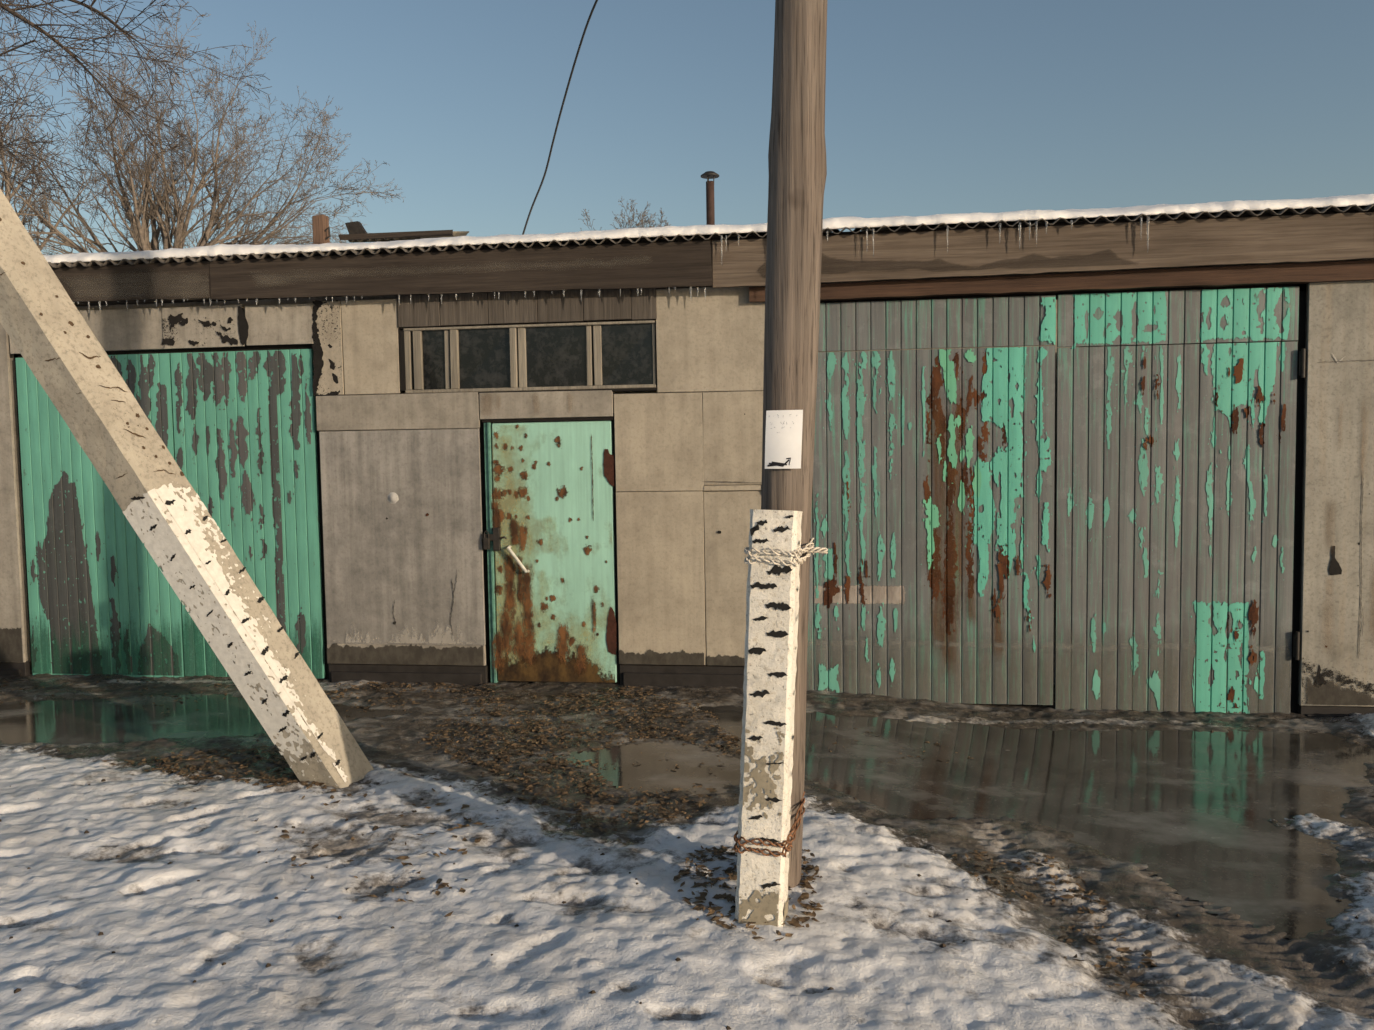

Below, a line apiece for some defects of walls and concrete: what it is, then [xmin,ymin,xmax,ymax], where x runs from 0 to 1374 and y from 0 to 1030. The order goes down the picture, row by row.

peeling [28,471,182,676]
peeling [96,300,348,787]
rust [491,424,617,683]
rust [923,352,1007,658]
peeling [814,291,1182,710]
rust [991,544,1022,650]
peeling [1191,600,1265,714]
peeling [1197,287,1290,558]
rust [1213,358,1286,447]
peeling [1252,535,1285,573]